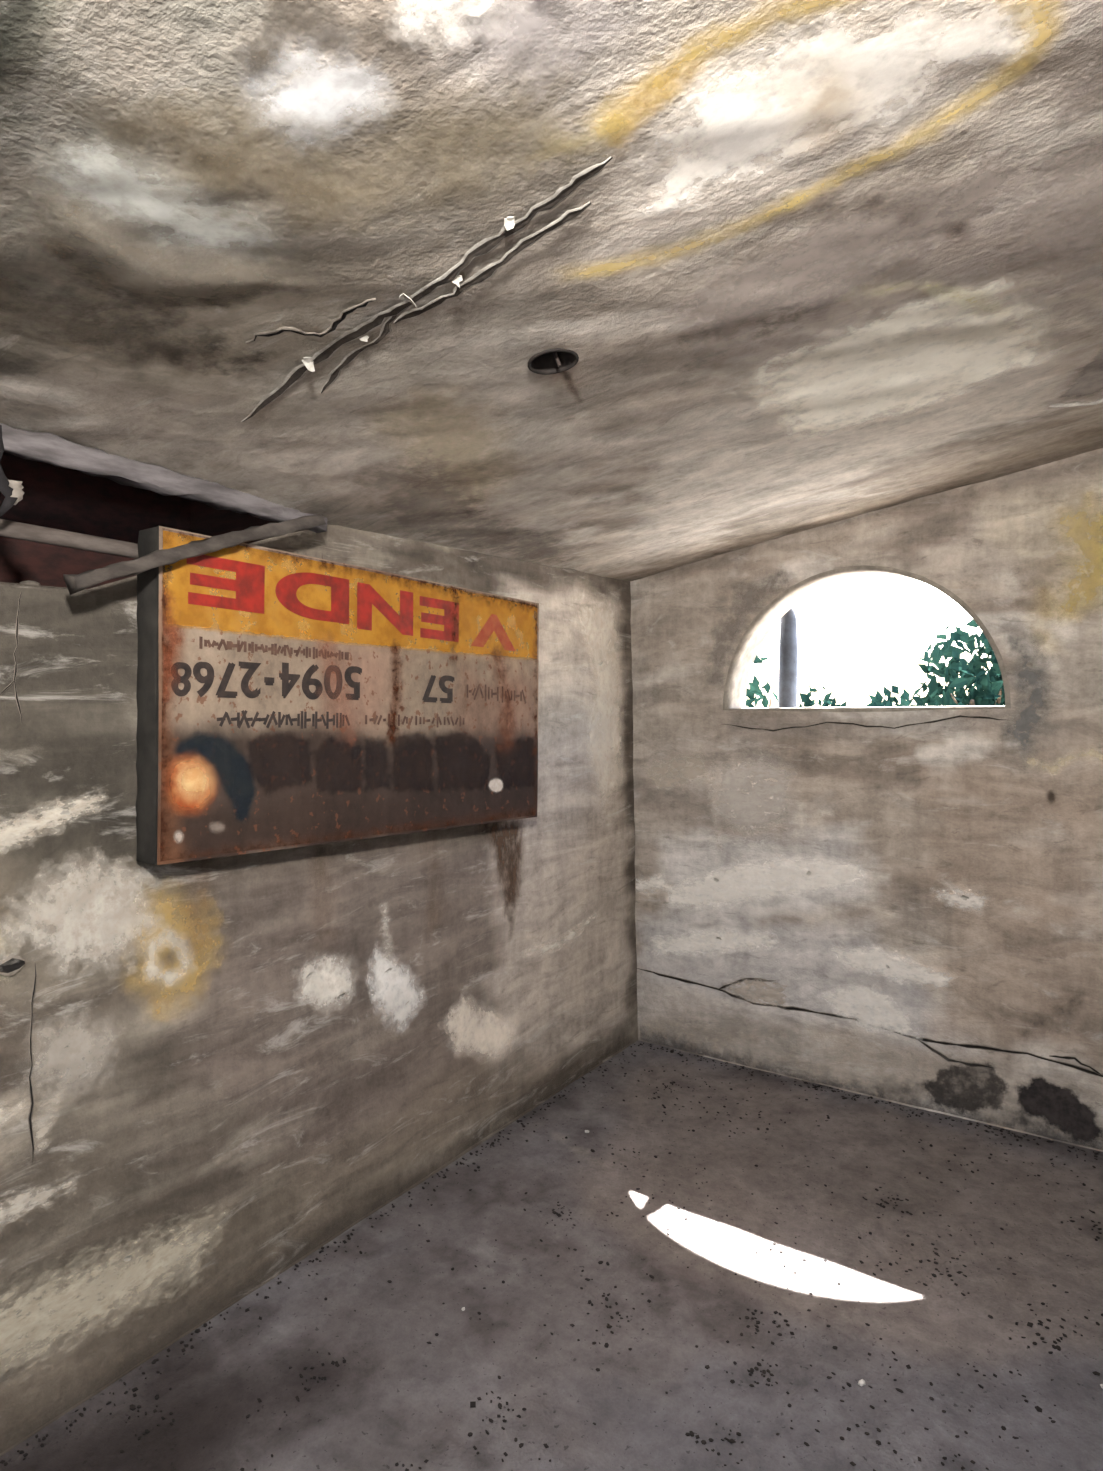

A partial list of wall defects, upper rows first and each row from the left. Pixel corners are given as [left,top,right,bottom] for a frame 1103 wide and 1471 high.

crack [241,156,613,422]
damp [686,156,1007,342]
crack [637,968,1103,1077]